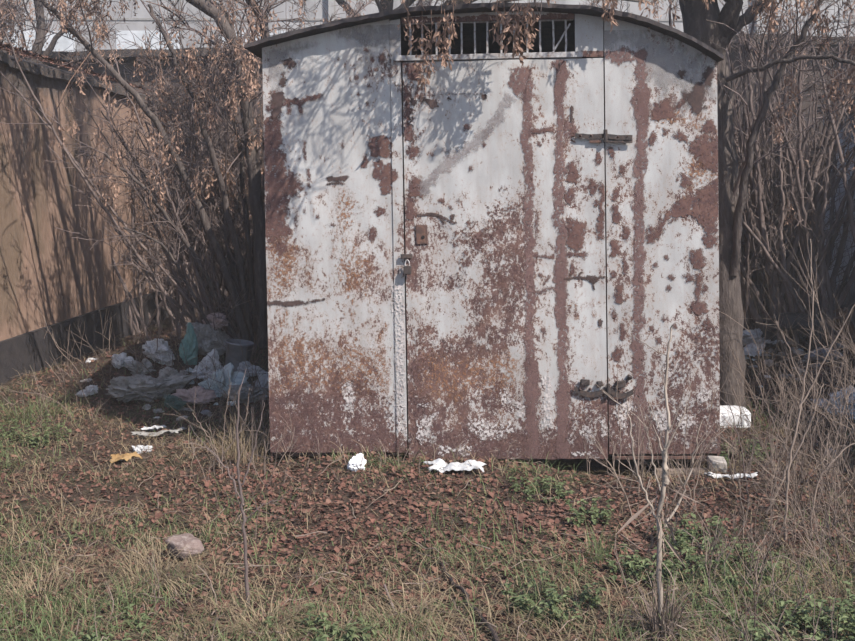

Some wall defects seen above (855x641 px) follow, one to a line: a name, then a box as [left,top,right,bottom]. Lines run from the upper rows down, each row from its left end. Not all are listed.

corrosion [267,45,720,459]